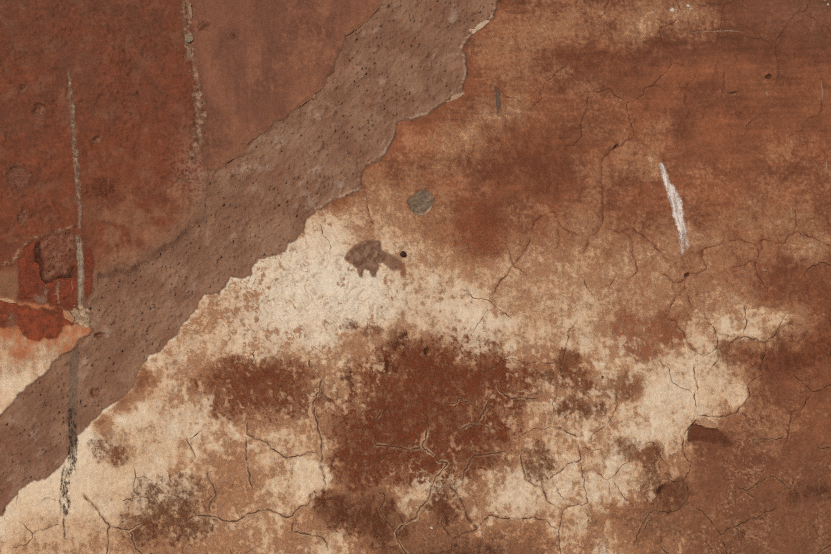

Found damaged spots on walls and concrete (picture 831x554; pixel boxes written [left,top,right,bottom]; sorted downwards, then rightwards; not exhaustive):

spalling [0,0,498,538]
crack [748,220,831,284]
crack [244,359,325,487]
water stain [0,165,831,554]
crack [374,336,626,554]
crack [645,308,790,546]
crack [752,376,831,446]
crack [83,493,151,554]
crack [198,473,329,548]